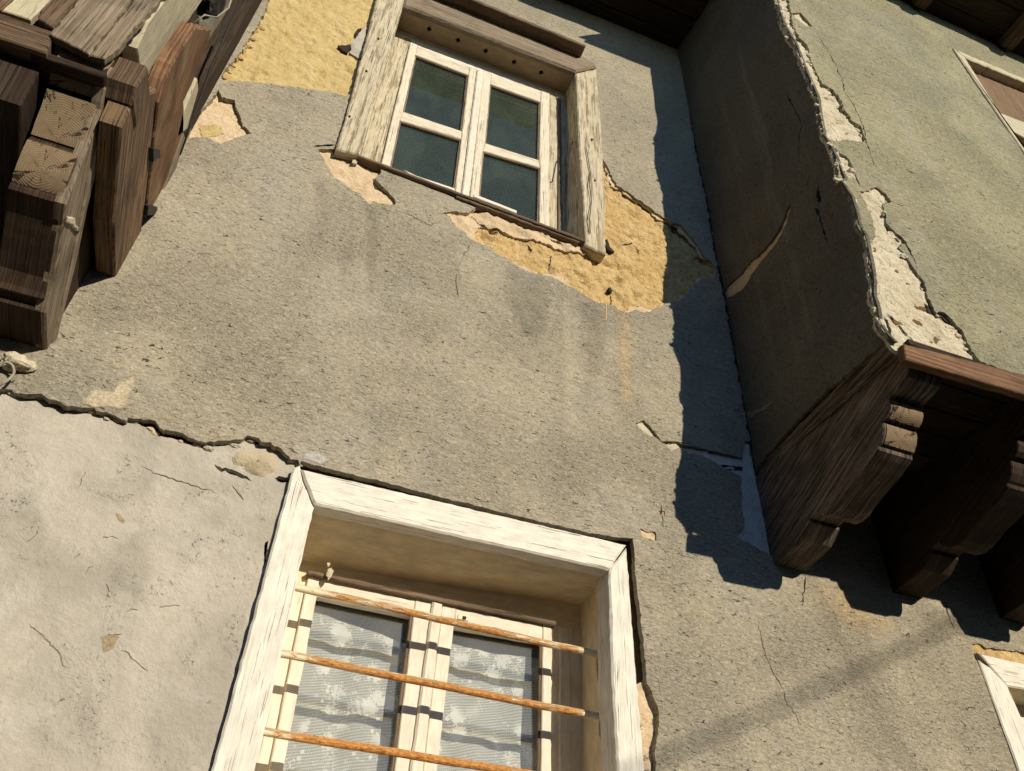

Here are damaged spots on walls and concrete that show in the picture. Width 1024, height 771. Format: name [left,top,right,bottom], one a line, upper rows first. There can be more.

flaking render [189,94,248,144]
spalling [221,0,376,96]
flaking render [774,0,863,185]
flaking render [320,152,394,205]
spalling [446,163,715,313]
flaking render [861,189,976,361]
crack [7,392,303,483]
crack [142,466,243,499]